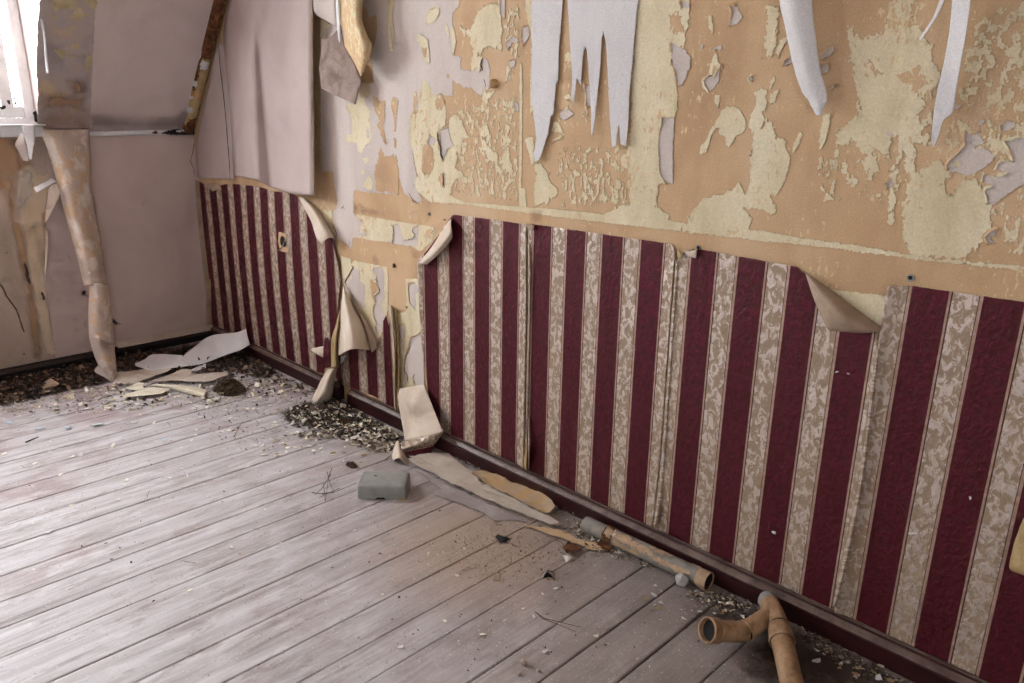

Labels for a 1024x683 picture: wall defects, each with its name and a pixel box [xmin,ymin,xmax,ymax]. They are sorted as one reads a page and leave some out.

peeling [0,0,98,369]
peeling [186,51,210,113]
peeling [299,0,1024,412]